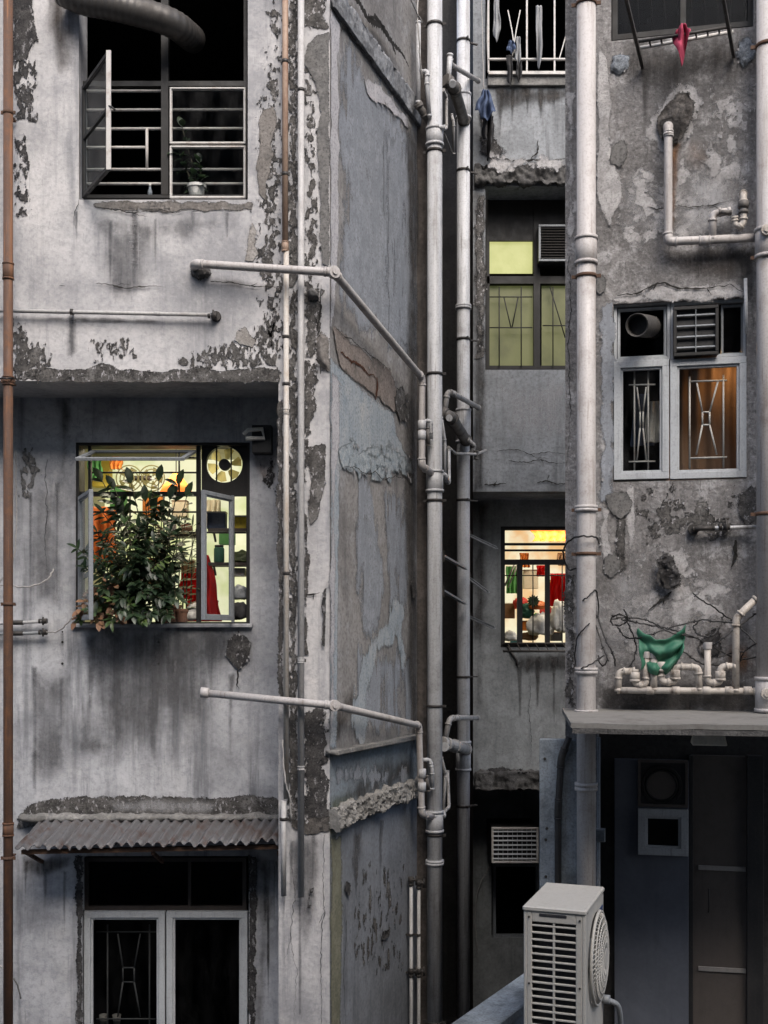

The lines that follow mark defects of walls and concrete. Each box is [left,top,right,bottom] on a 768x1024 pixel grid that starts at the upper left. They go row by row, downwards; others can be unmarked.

peeling [478,91,577,237]
peeling [596,47,756,256]
crack [617,282,743,296]
peeling [13,0,417,1024]
crack [648,591,672,611]
peeling [596,275,756,658]
crack [730,540,738,567]
damp [90,629,229,738]